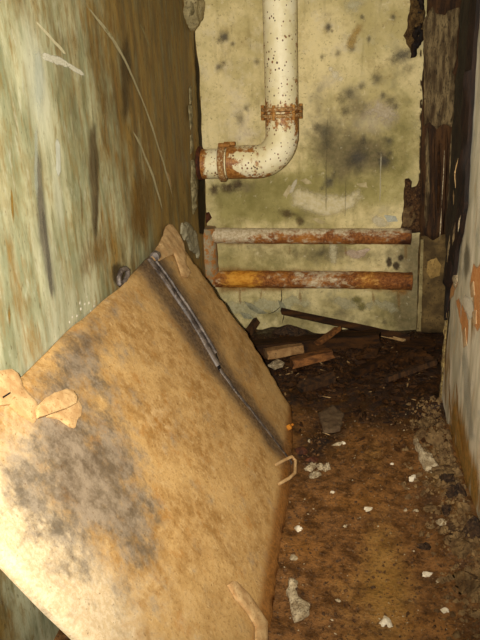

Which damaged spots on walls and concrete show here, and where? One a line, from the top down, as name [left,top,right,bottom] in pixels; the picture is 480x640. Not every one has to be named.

spalling [183,0,205,31]
peeling [450,265,480,348]